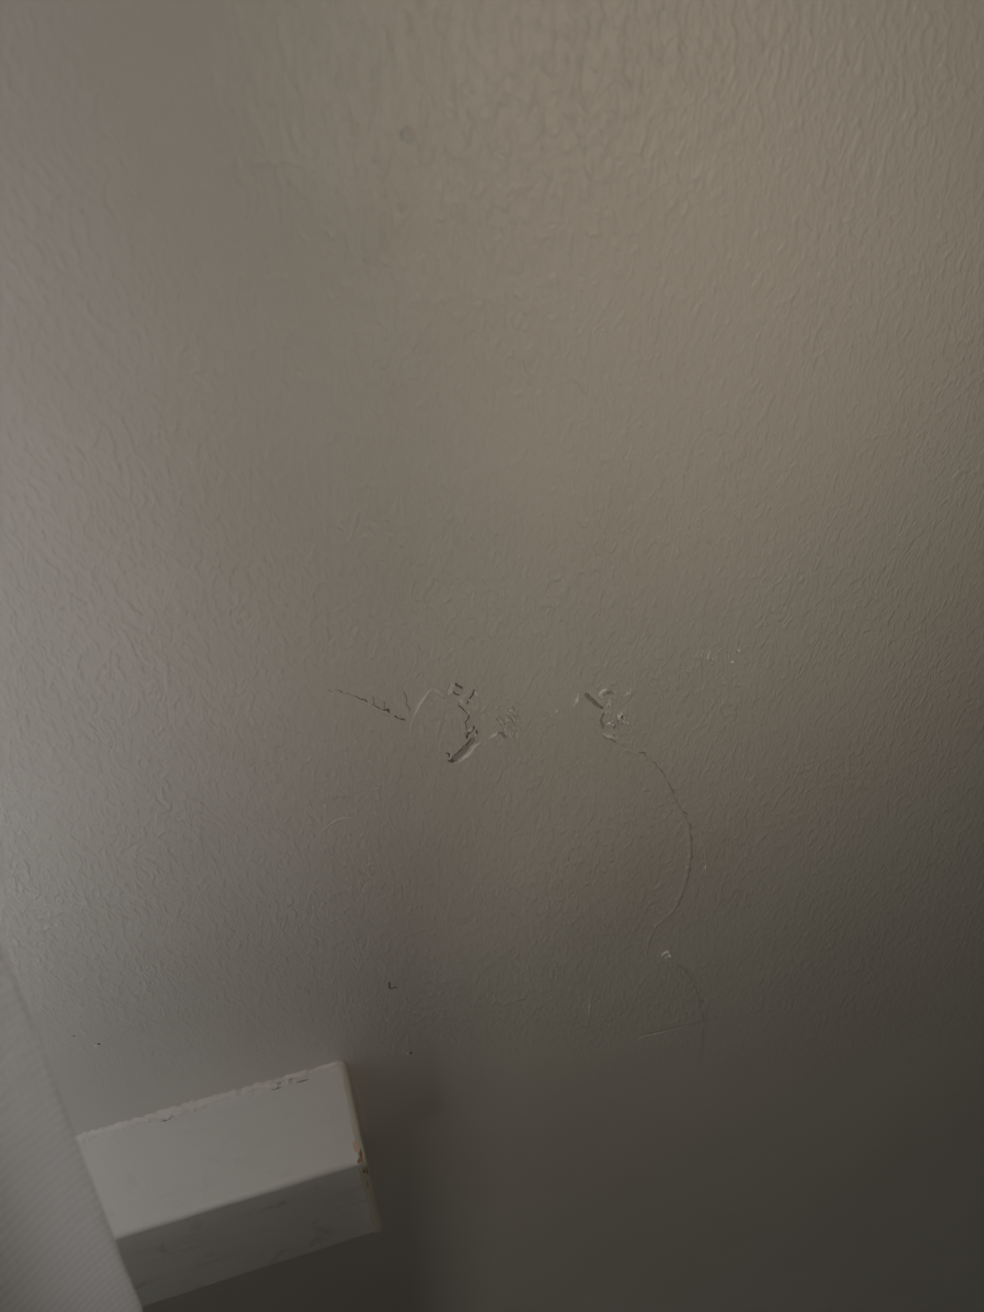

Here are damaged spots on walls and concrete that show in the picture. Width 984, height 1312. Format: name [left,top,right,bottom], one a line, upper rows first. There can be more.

crack [329,689,410,722]
peeling [413,683,482,763]